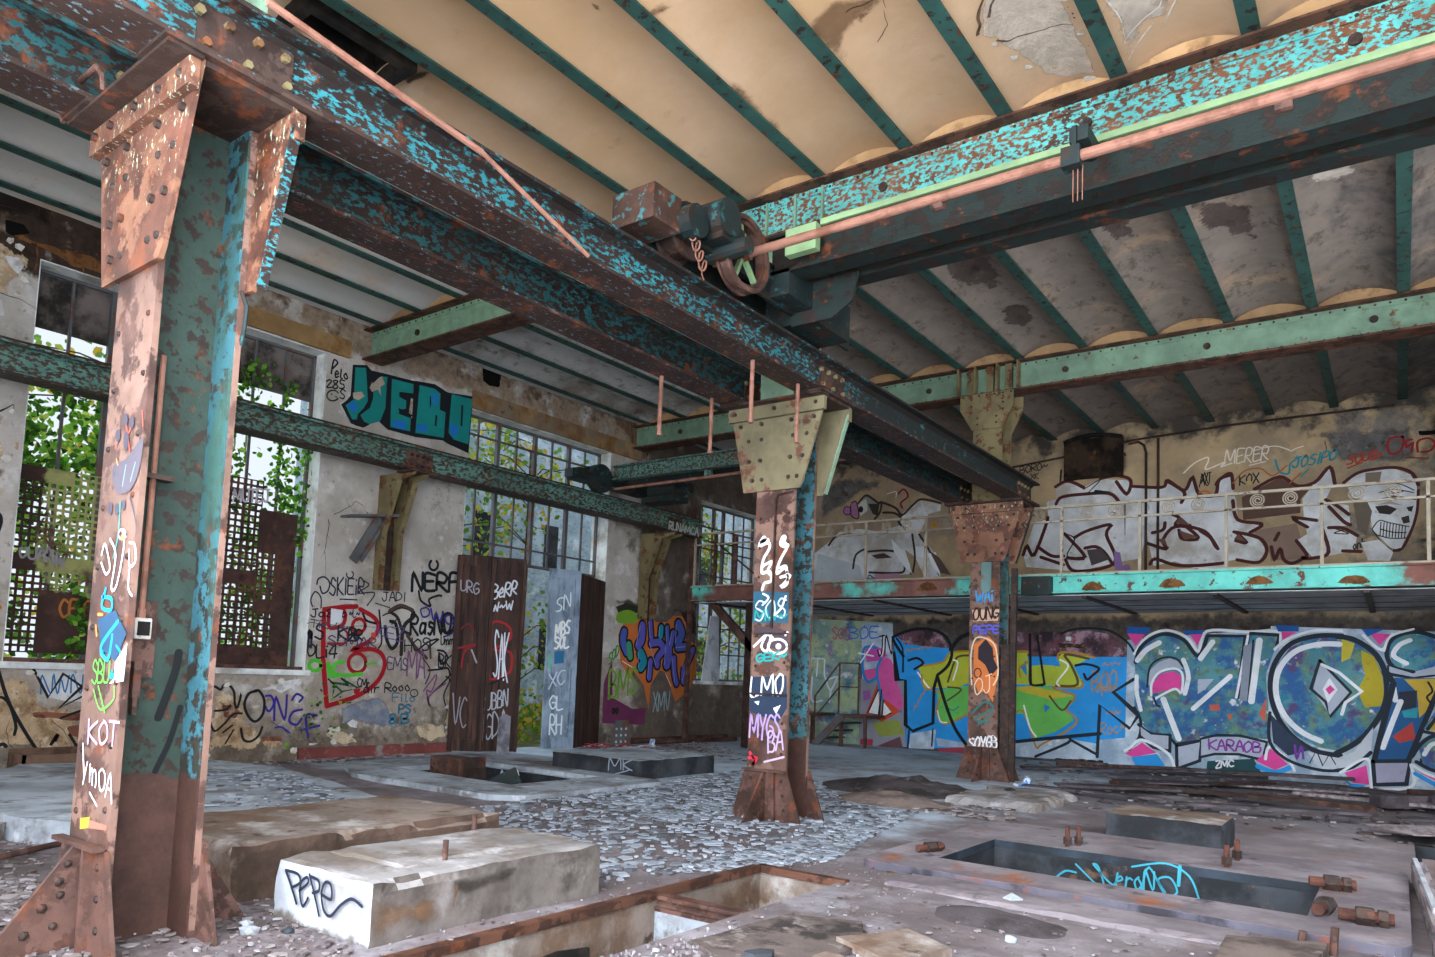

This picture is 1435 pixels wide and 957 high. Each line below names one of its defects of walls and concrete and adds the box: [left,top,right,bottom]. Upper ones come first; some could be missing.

spalling [976,0,1096,81]
spalling [0,237,36,316]
rust [1082,581,1106,591]
rust [1159,578,1186,589]
rust [1245,575,1273,586]
rust [1338,575,1370,585]